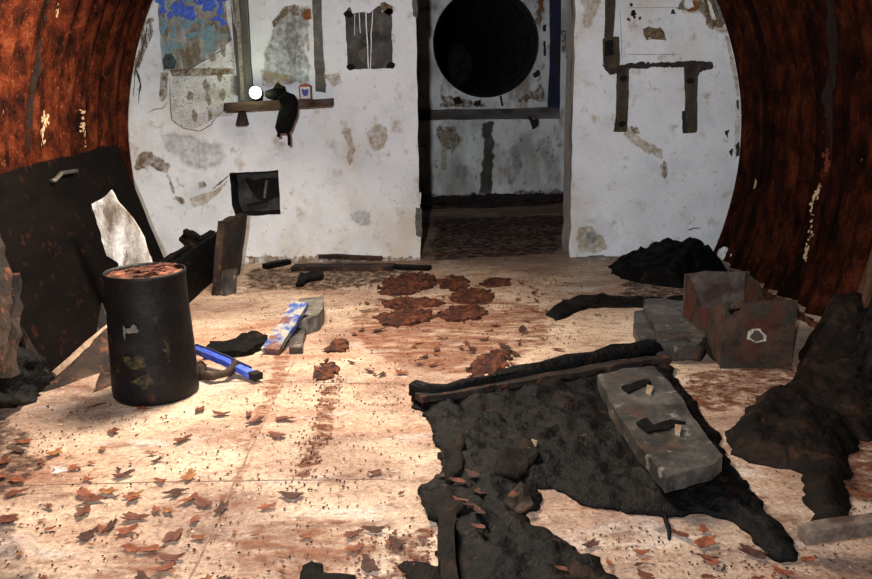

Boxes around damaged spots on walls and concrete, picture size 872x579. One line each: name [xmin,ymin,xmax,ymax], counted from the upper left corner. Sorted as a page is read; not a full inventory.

flaking render [627,3,666,41]
peeling [155,0,238,131]
water stain [458,121,494,196]
peeling [822,148,831,173]
peeling [803,183,822,262]